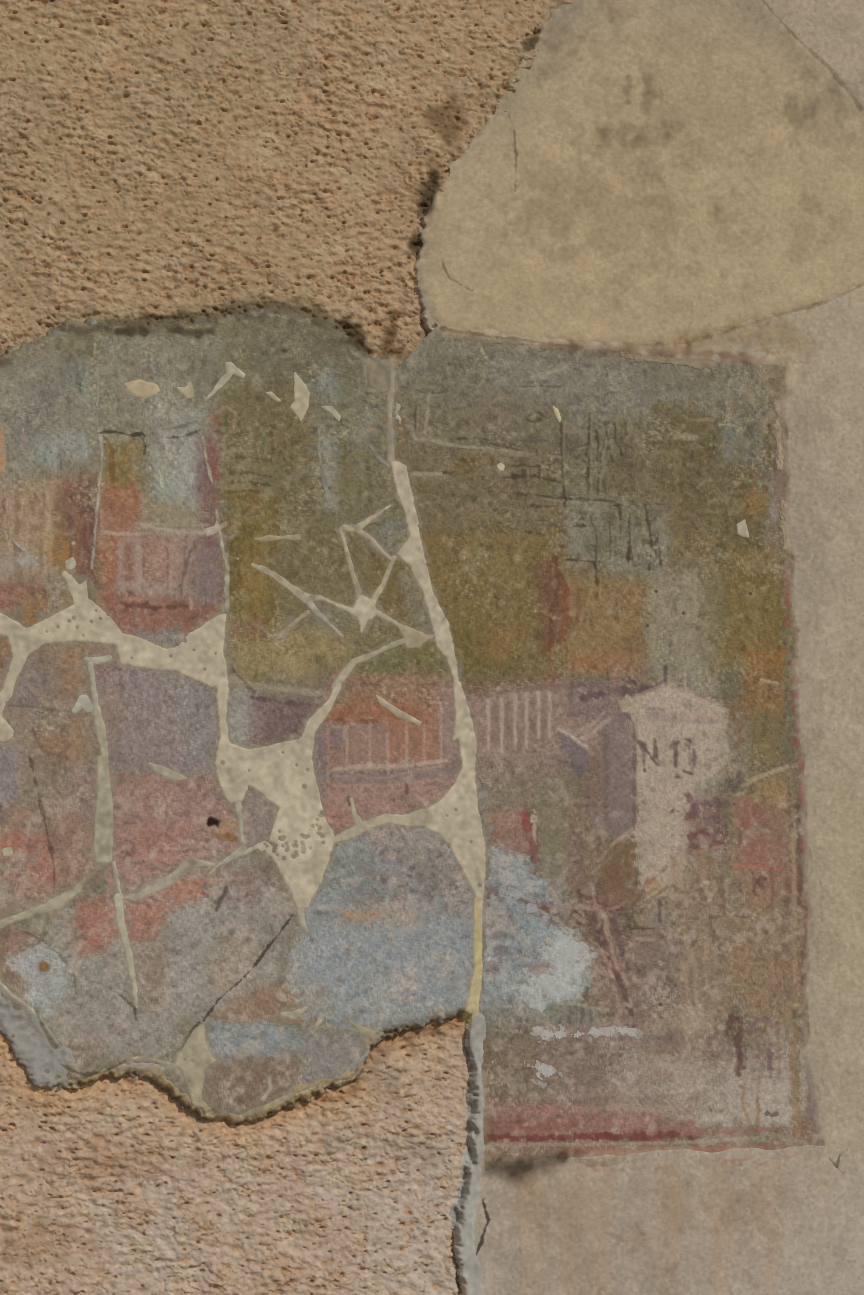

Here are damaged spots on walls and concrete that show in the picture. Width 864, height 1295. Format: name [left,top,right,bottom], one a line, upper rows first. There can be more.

peeling [124,379,160,399]
peeling [177,362,245,399]
peeling [266,372,341,421]
crack [87,343,144,569]
crack [369,444,390,467]
crack [200,436,239,612]
crack [203,915,293,1021]